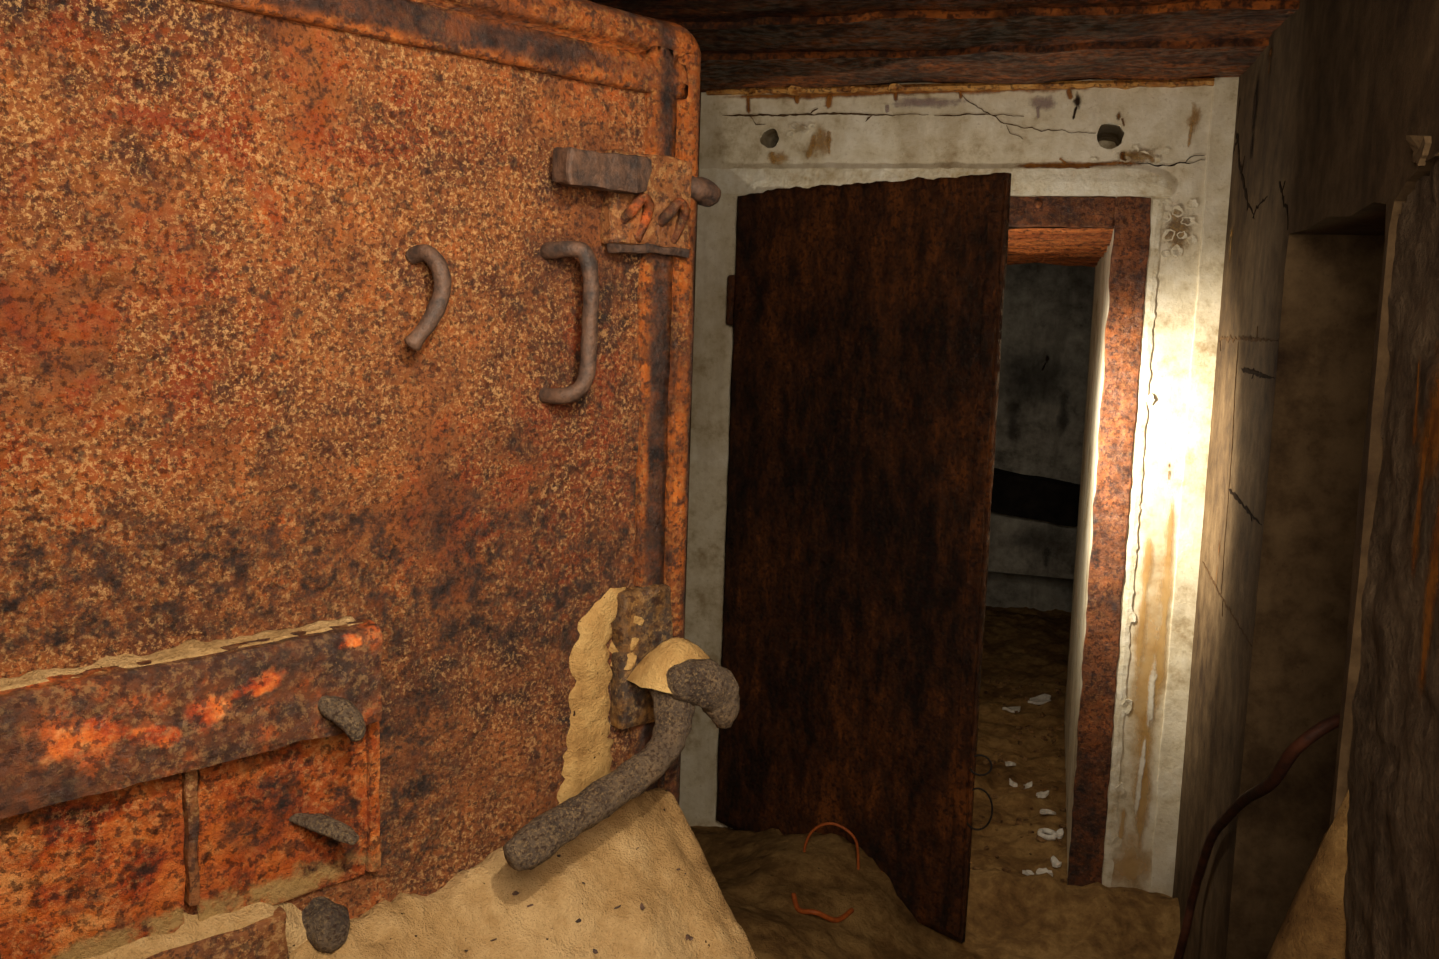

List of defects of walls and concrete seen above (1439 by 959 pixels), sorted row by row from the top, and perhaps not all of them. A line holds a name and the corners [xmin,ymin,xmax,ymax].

crack [724,95,1094,137]